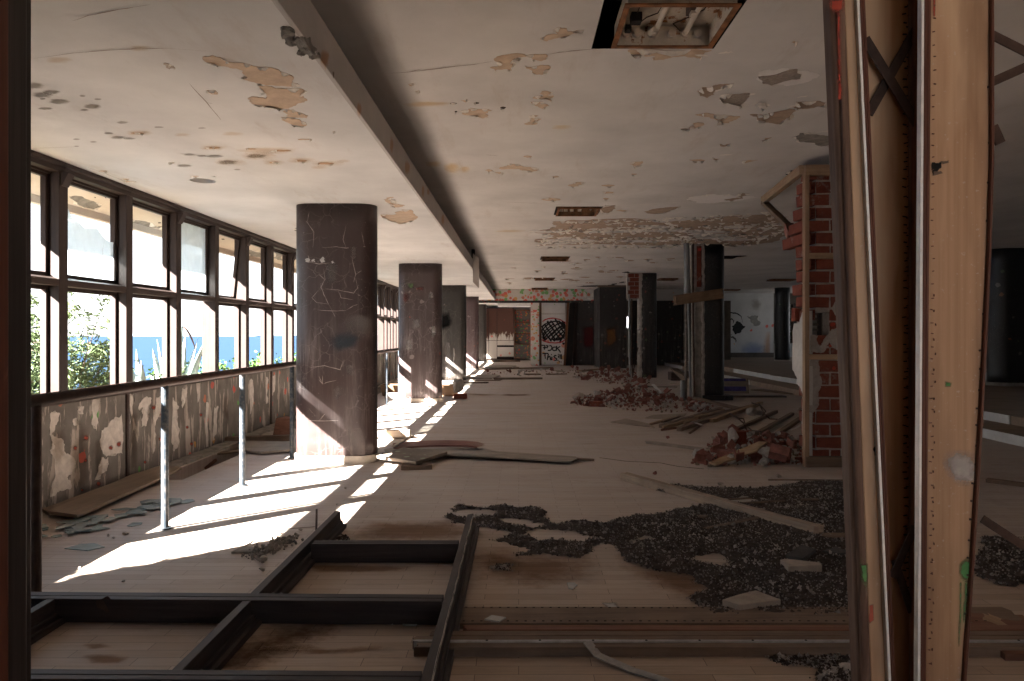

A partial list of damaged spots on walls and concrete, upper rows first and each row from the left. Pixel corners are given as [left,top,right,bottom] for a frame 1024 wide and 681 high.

spalling [280,26,321,60]
peeling [490,53,551,75]
peeling [202,55,312,141]
peeling [450,99,506,119]
peeling [681,84,827,132]
peeling [380,197,418,224]
crack [300,214,365,316]
peeling [534,184,796,301]